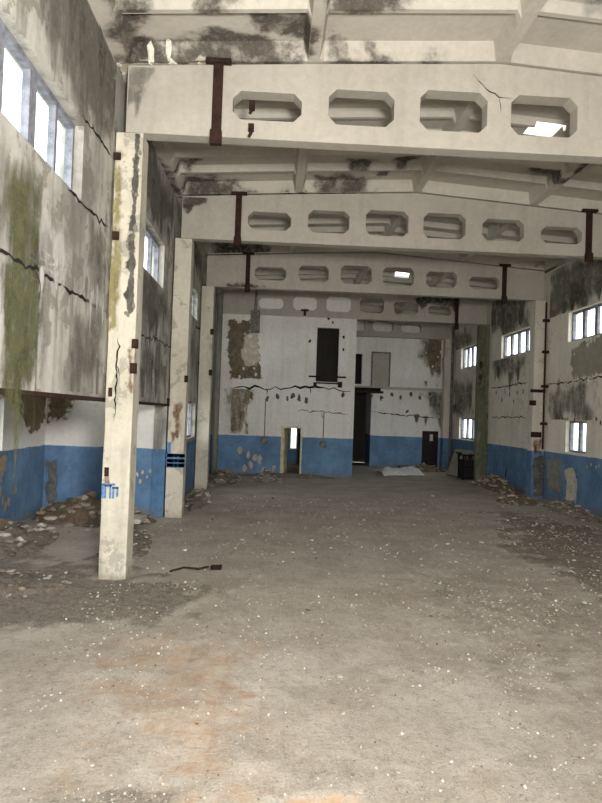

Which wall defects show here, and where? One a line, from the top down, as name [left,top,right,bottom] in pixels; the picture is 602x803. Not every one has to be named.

leakage [41,0,319,130]
leakage [315,158,372,194]
leakage [377,156,417,176]
crack [68,190,107,226]
crack [0,248,106,312]
leakage [535,260,602,318]
leakage [0,265,38,481]
spalling [224,315,262,380]
peeling [571,333,602,384]
spalling [4,395,80,434]
crack [234,385,349,417]
peeling [533,454,578,504]